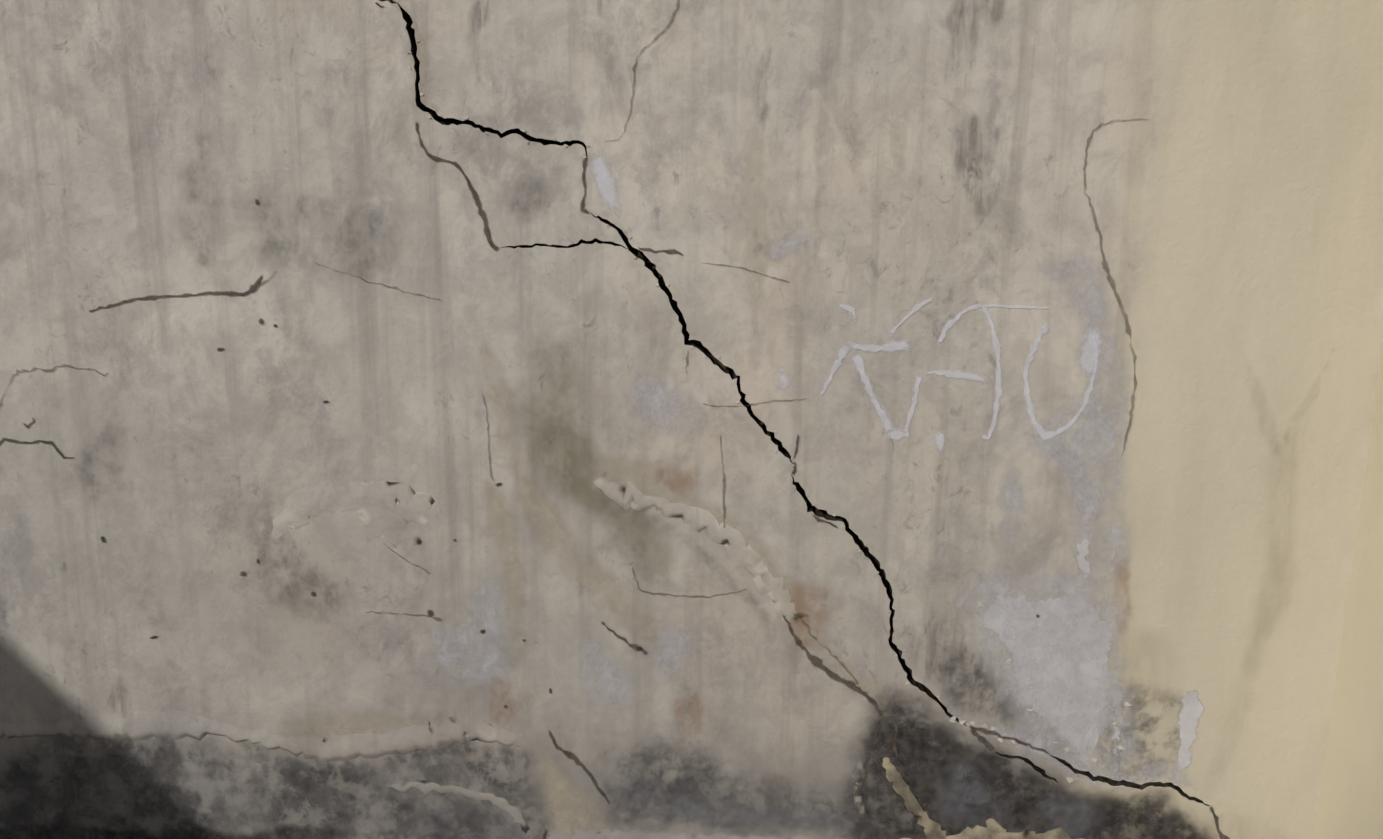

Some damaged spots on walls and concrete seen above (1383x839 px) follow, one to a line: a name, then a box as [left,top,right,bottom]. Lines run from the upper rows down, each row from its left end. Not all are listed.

crack [89,272,275,312]
crack [0,365,105,459]
crack [375,0,1230,839]
peeling [975,578,1146,787]
water stain [0,740,382,839]
water stain [343,744,530,839]
water stain [845,699,1203,839]
peeling [1174,690,1204,781]